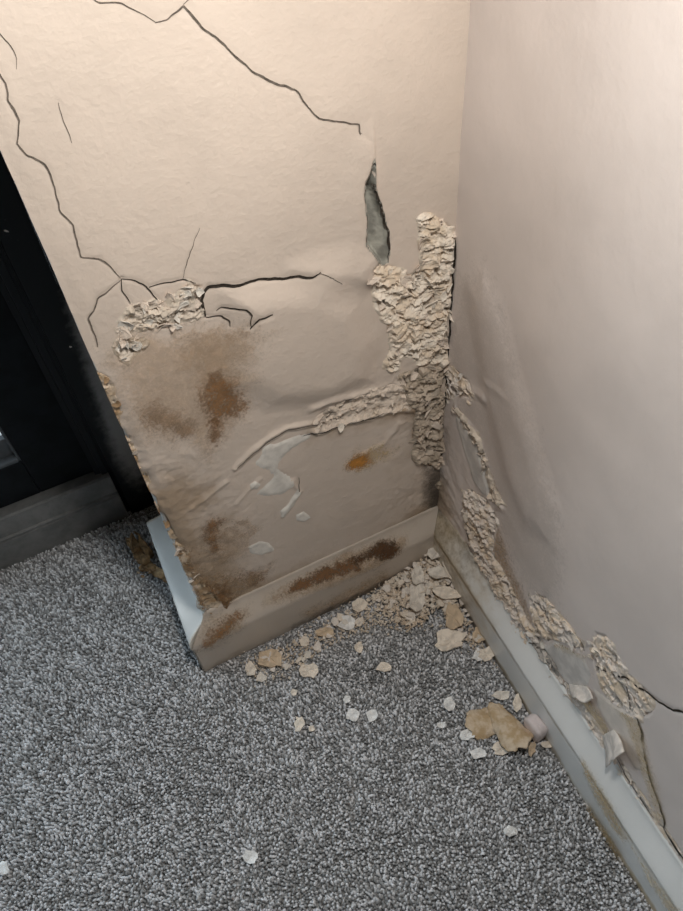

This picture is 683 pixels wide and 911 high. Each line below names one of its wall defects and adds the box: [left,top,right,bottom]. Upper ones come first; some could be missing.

crack [94,0,362,135]
crack [0,34,342,347]
crack [373,186,391,260]
flaking render [111,278,206,366]
corrosion [348,447,387,470]
flaking render [245,159,683,860]
leakage [183,563,263,609]
crack [596,666,683,858]